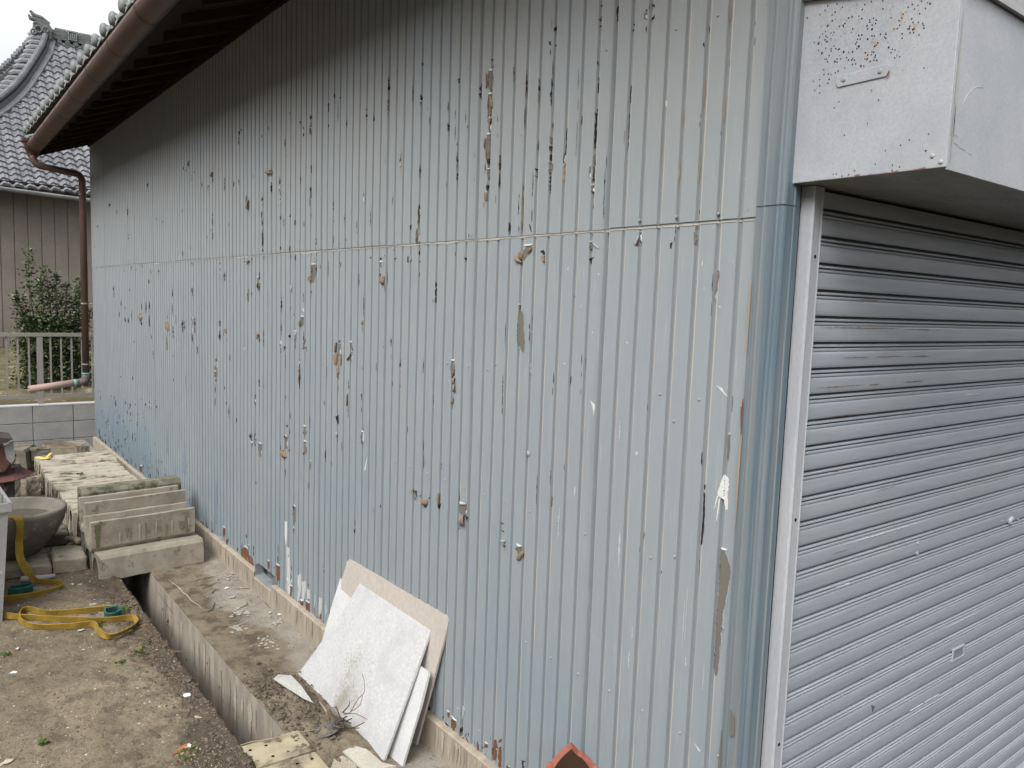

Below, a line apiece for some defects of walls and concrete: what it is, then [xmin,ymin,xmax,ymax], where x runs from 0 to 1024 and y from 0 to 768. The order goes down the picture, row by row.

peeling [485,66,494,178]
peeling [517,305,525,353]
rust [242,545,253,565]
peeling [714,547,730,676]
rust [447,712,510,768]